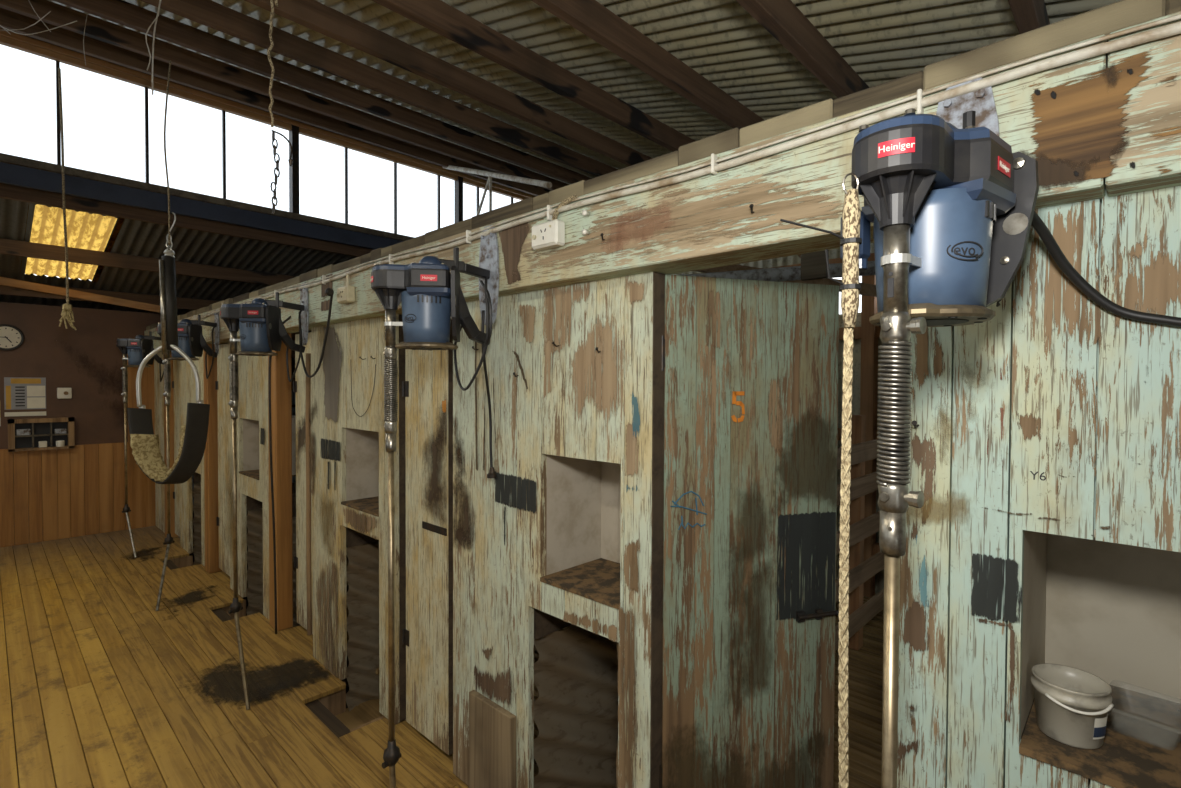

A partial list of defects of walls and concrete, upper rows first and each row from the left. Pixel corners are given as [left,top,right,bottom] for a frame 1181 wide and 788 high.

peeling [1029,51,1181,180]
peeling [499,163,843,285]
peeling [519,282,640,477]
peeling [628,280,644,304]
peeling [669,281,781,556]
peeling [909,327,946,416]
peeling [1002,195,1181,492]
peeling [911,432,936,539]
peeling [316,562,339,677]
peeling [899,600,930,673]
peeling [978,618,1017,722]
peeling [897,740,919,769]